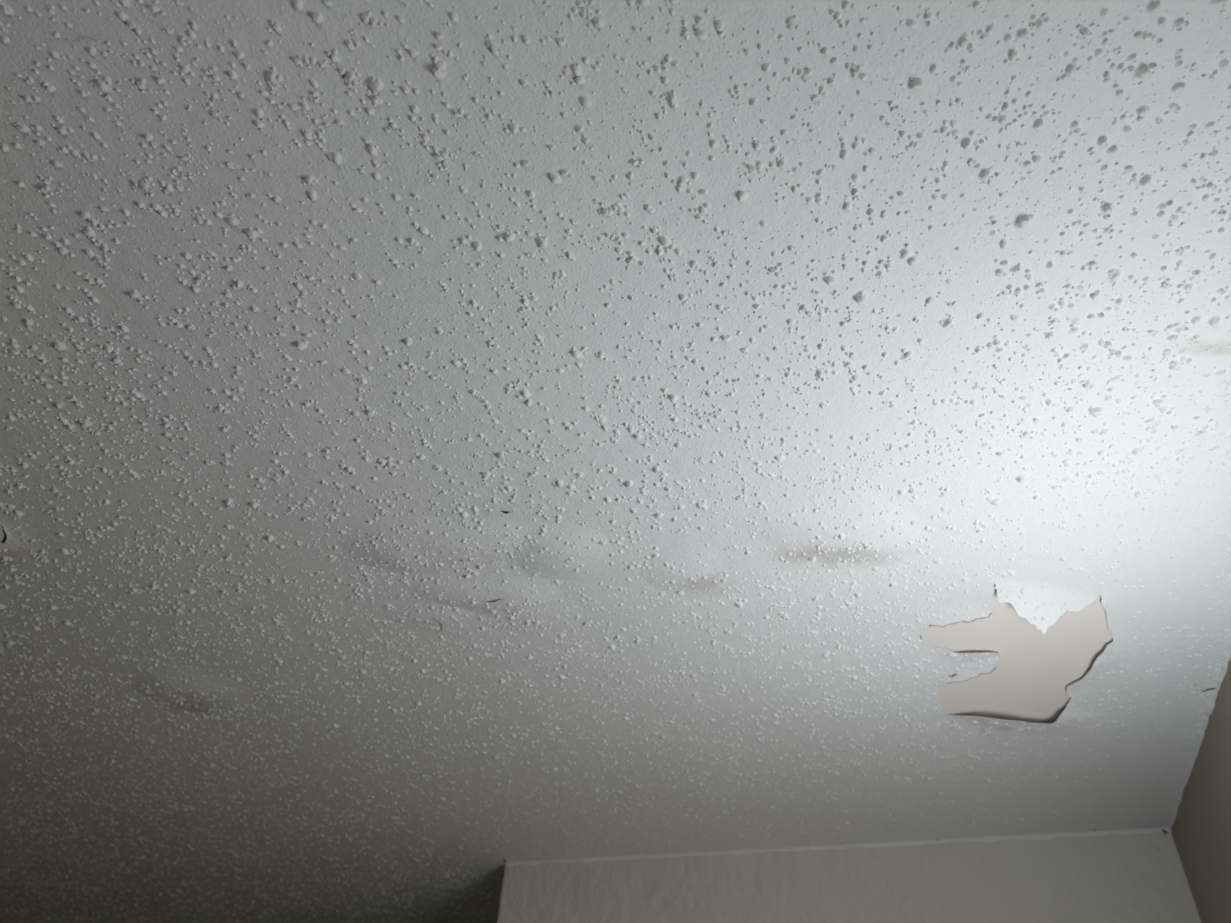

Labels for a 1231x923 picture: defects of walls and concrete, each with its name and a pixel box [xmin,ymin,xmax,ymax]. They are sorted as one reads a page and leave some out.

peeling [915,578,1145,746]